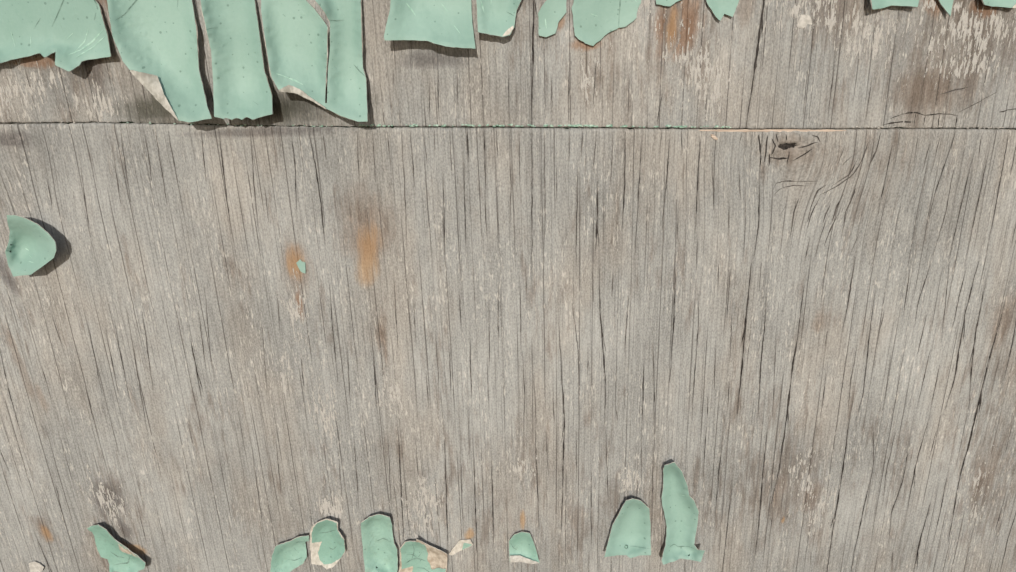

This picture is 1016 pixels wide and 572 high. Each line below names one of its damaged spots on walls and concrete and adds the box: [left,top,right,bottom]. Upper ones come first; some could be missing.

peeling [0,0,368,123]
peeling [384,0,522,49]
crack [114,85,179,203]
crack [201,129,231,227]
crack [291,134,326,241]
peeling [5,215,57,277]
crack [357,0,1016,572]
crack [85,309,153,428]
crack [330,294,351,406]
peeling [87,524,146,572]
peeling [361,514,473,572]
peeling [604,462,705,565]